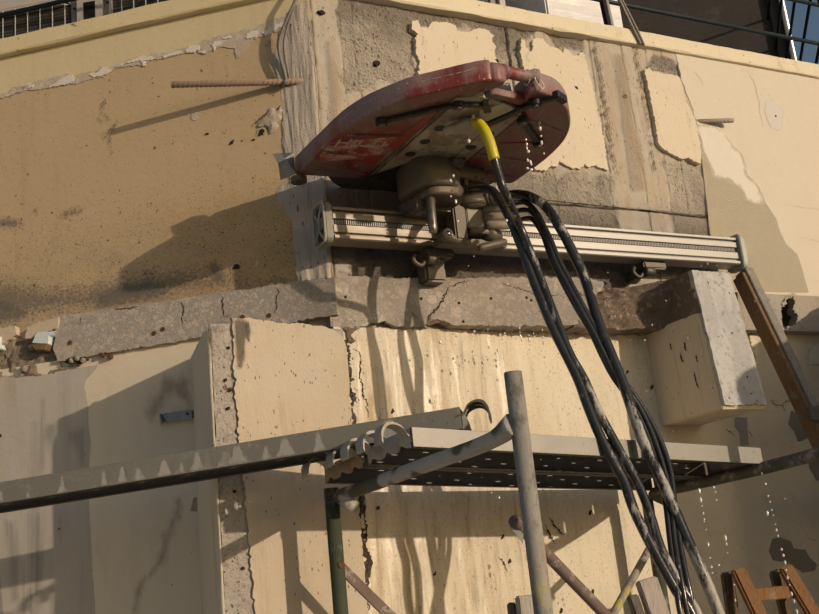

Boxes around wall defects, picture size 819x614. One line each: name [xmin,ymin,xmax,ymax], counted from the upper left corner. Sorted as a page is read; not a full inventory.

spalling [0,0,734,236]
spalling [277,174,421,281]
crack [412,280,468,323]
spalling [444,253,527,279]
spalling [537,258,557,278]
peeling [0,317,98,482]
crack [344,339,369,424]
peeling [0,499,95,614]
crack [358,495,373,611]